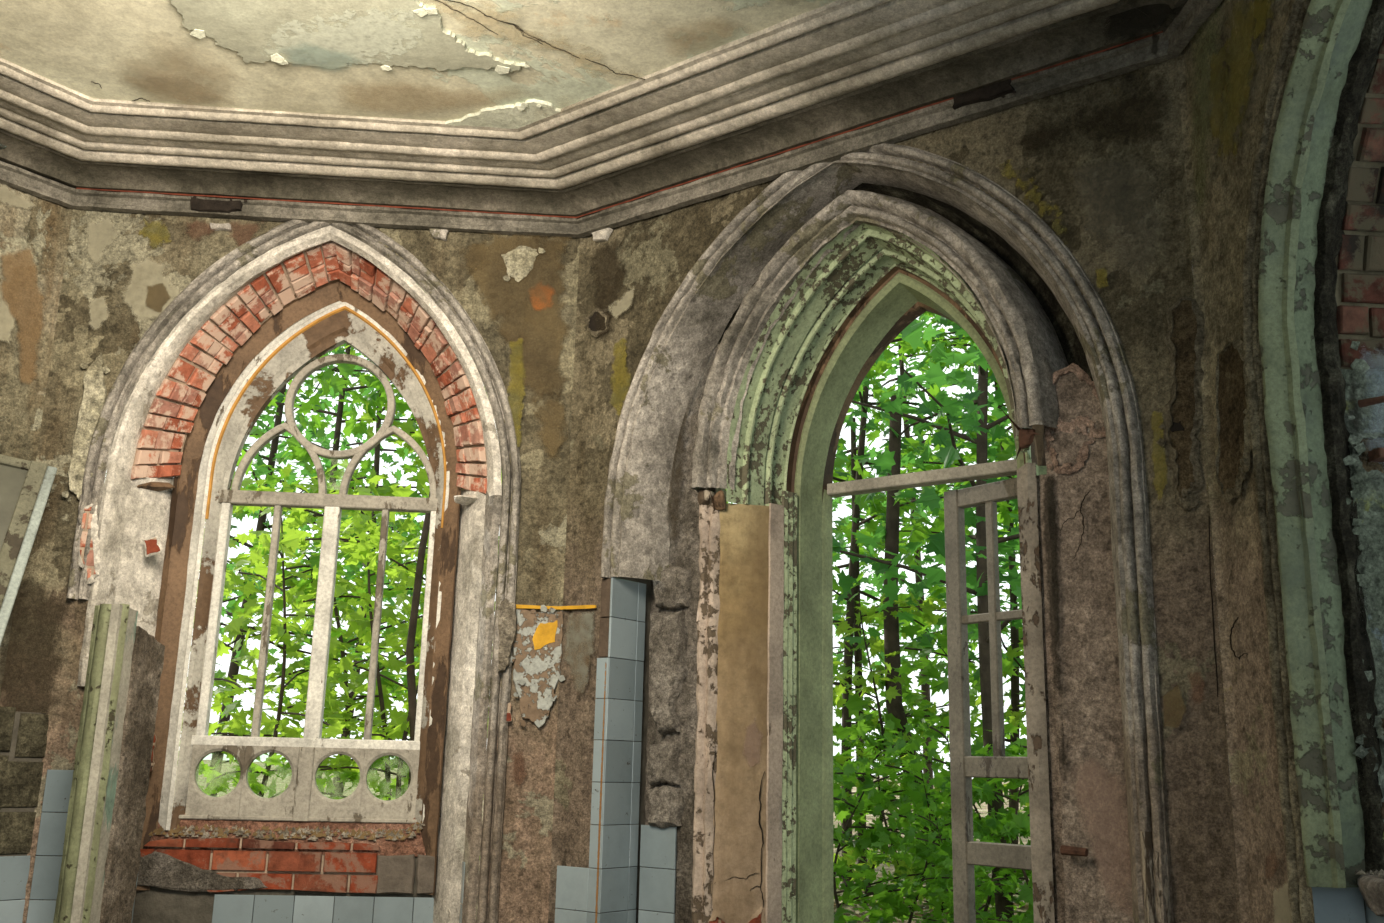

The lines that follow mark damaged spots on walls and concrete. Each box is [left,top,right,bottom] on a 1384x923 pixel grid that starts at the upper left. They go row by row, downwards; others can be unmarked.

peeling [170,0,636,76]
crack [435,0,645,80]
peeling [445,99,561,129]
flaking render [209,198,247,232]
flaking render [0,249,43,383]
peeling [89,296,108,329]
flaking render [124,241,487,494]
flaking render [1336,37,1384,624]
peeling [506,605,593,728]
flaking render [0,706,49,855]
spalling [1352,710,1384,772]